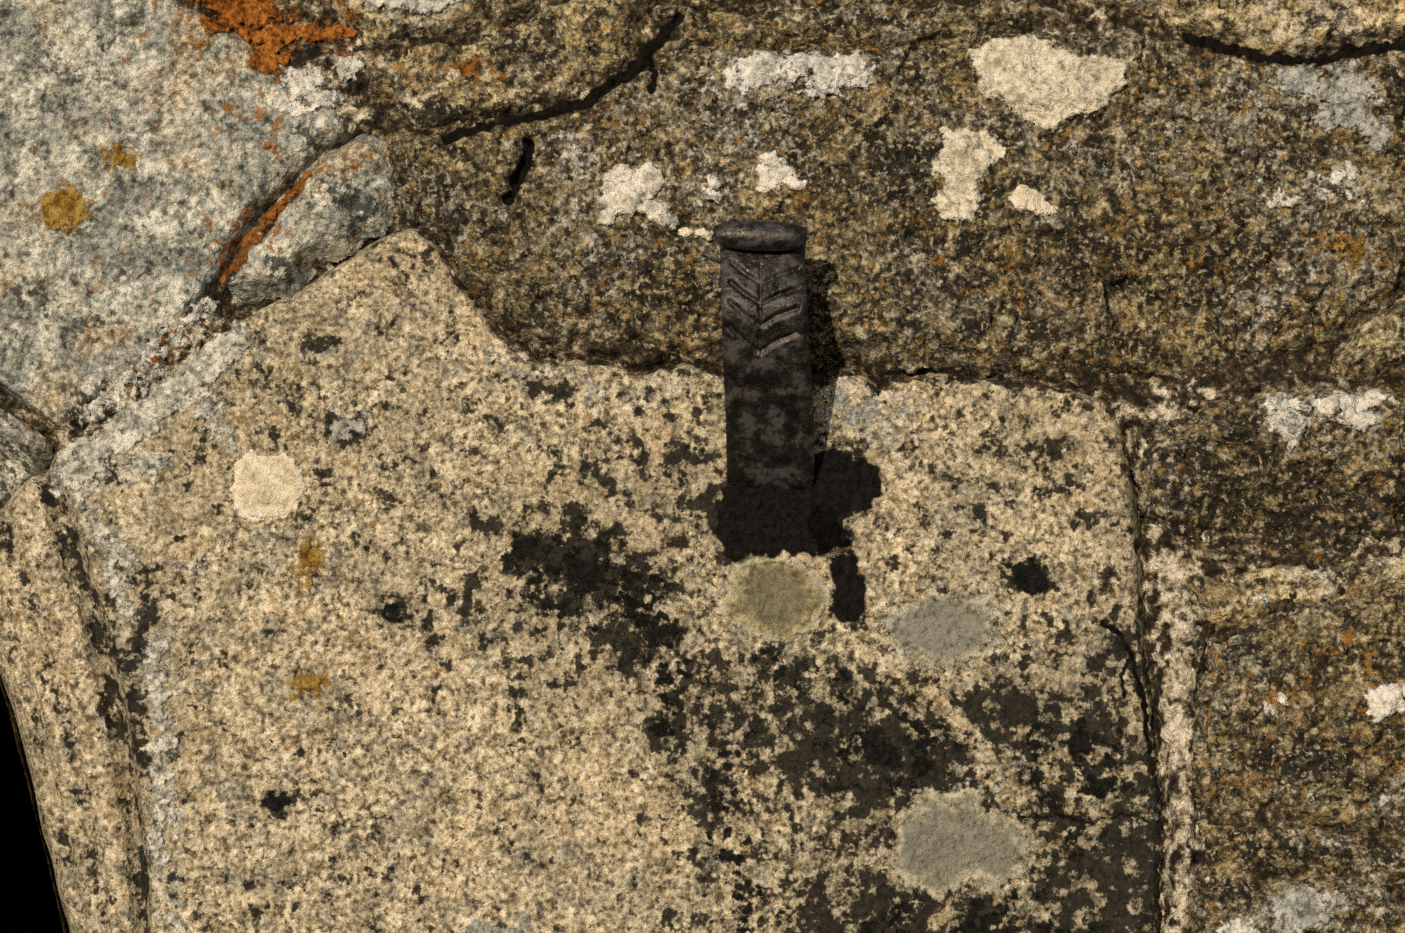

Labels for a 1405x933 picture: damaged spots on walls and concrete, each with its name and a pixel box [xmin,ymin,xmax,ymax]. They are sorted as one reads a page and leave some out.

crack [1101,620,1152,752]